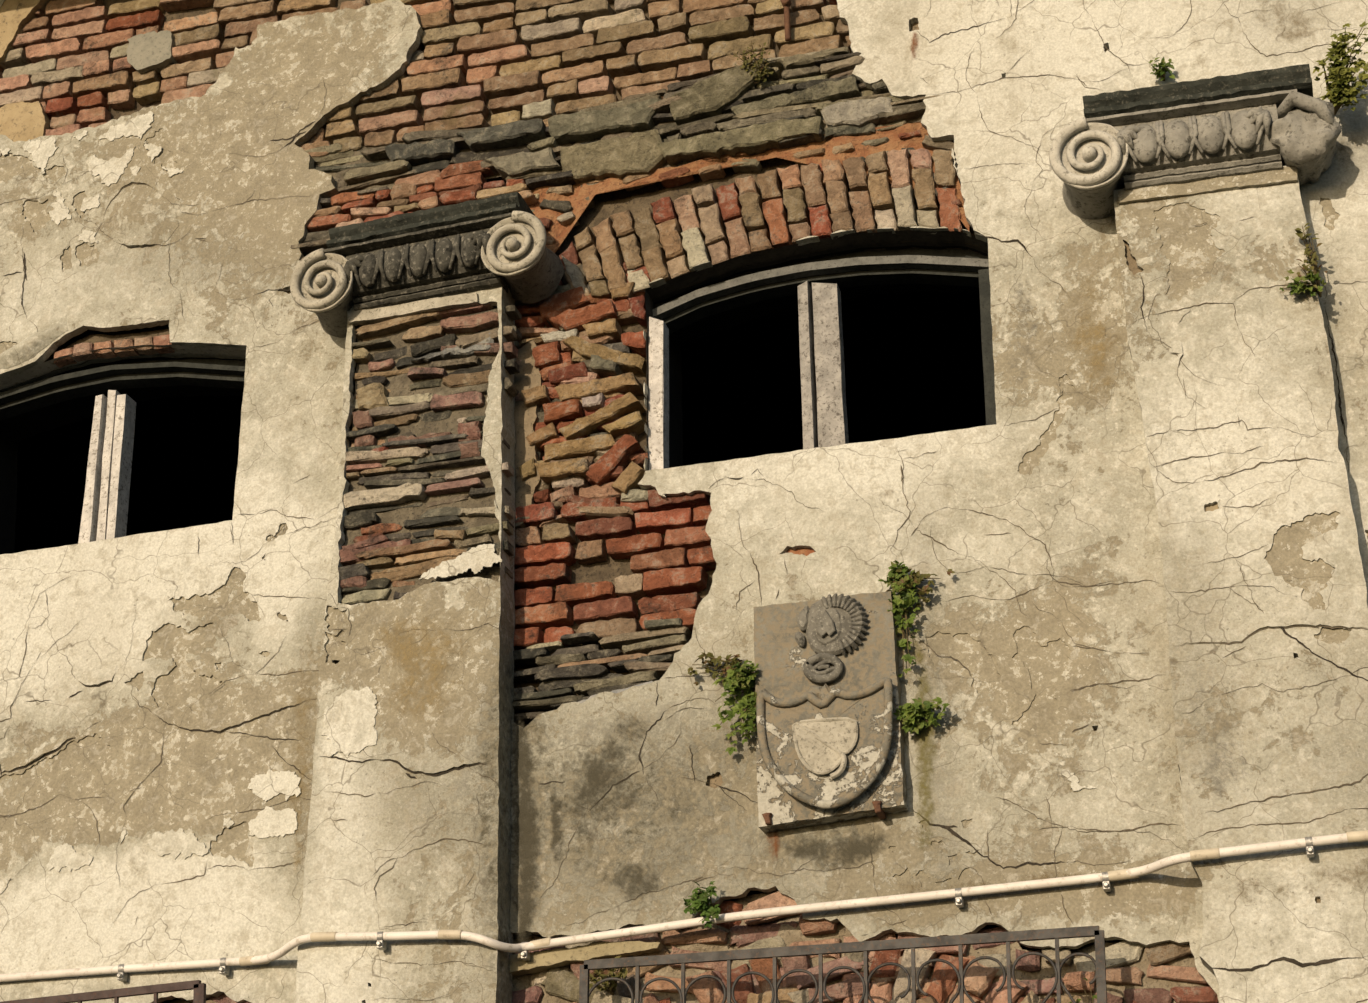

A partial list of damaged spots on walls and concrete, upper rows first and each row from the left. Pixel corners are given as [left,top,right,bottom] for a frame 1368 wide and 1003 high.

crack [0,80,327,349]
crack [919,0,1367,298]
spalling [0,0,986,728]
crack [1136,275,1367,508]
crack [882,449,1368,714]
peeling [1264,512,1339,610]
spalling [170,993,251,1003]
peeling [148,769,302,867]
crack [0,575,497,1001]
peeling [321,686,378,758]
spalling [512,891,1219,1003]
crack [913,774,1368,922]